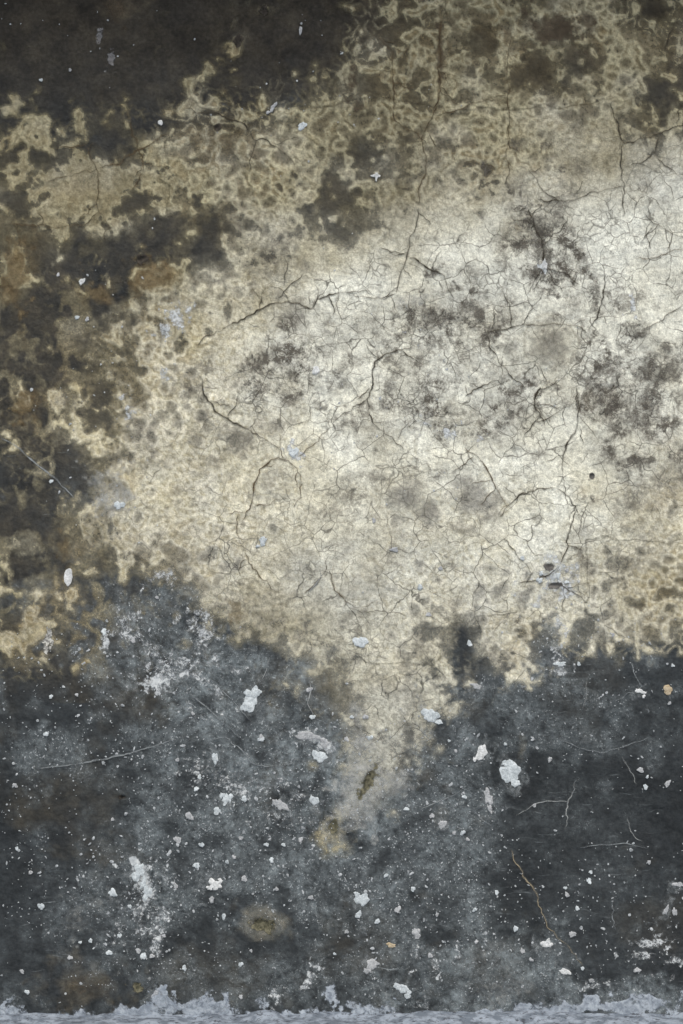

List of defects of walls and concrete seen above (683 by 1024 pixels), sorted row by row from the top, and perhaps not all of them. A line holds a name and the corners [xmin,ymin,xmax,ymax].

crack [187,0,541,345]
crack [466,105,683,461]
crack [198,347,418,529]
leakage [0,0,683,807]
crack [458,449,583,605]
leakage [129,849,176,955]
leakage [614,939,683,968]